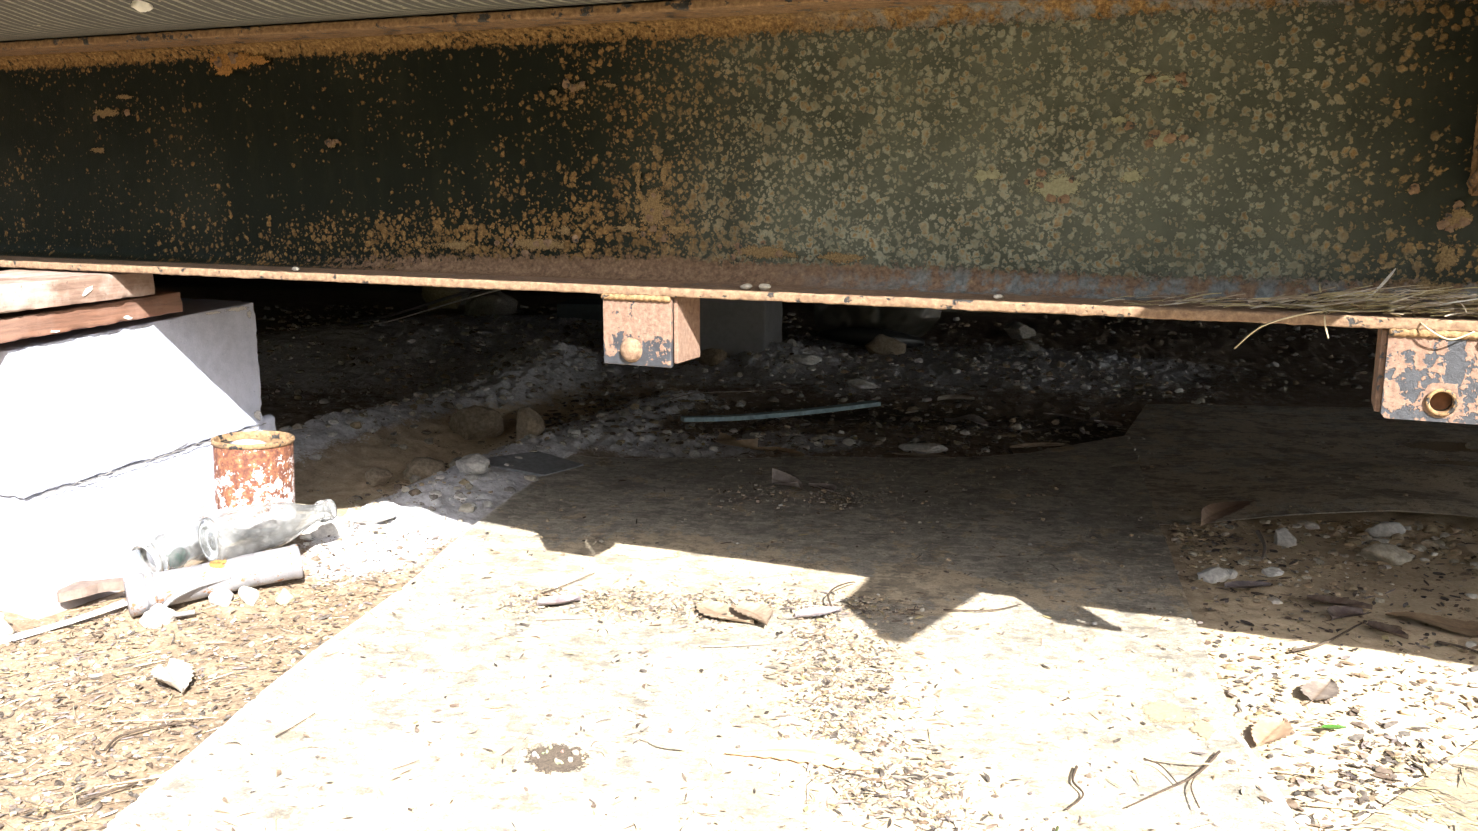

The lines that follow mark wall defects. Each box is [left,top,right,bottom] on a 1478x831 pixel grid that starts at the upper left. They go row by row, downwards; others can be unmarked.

rust [206,52,270,77]
rust [1411,200,1474,299]